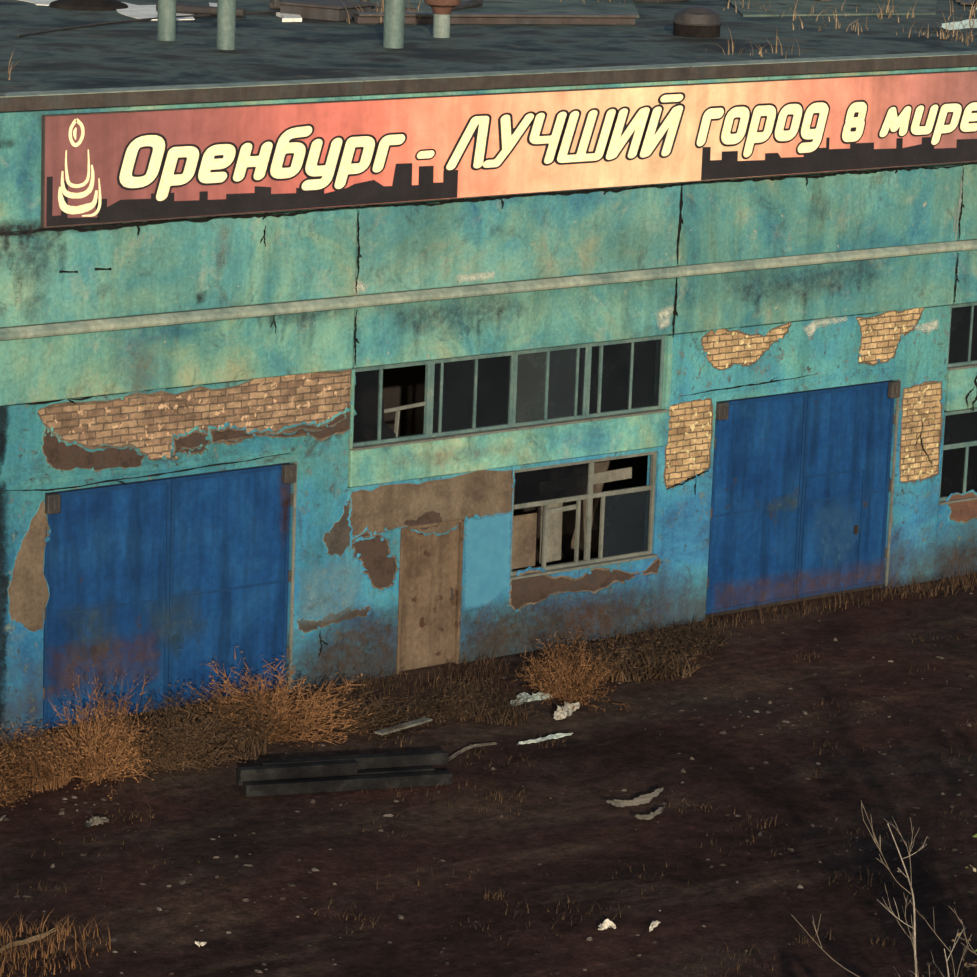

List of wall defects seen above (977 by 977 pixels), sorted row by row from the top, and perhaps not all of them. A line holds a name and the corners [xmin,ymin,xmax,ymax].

crack [0,162,977,364]
flaking render [36,368,357,472]
flaking render [661,395,715,491]
flaking render [698,322,791,372]
flaking render [854,307,925,368]
flaking render [897,378,944,485]
crack [966,376,977,411]
flaking render [7,500,51,633]
flaking render [322,469,515,593]
flaking render [506,555,663,614]
flaking render [946,490,977,525]